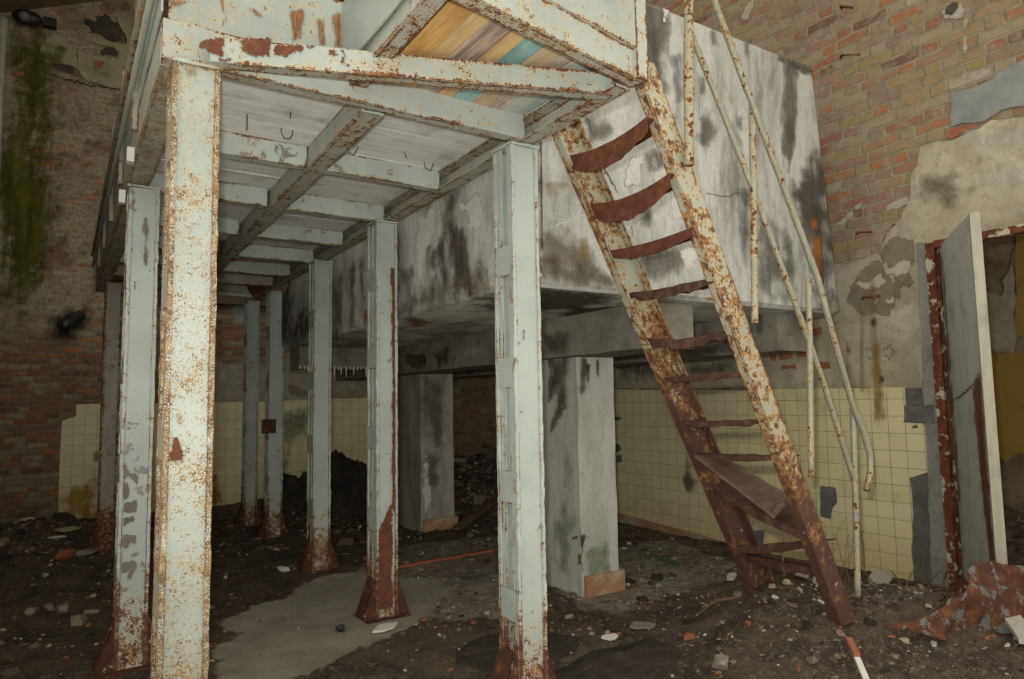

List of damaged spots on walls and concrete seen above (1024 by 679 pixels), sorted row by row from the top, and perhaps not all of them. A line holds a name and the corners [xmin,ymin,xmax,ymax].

rust [199,37,231,61]
rust [238,9,350,67]
water stain [646,1,680,95]
water stain [779,55,813,160]
flaking render [945,123,978,139]
water stain [402,193,495,312]
water stain [539,236,614,316]
rust [811,216,821,276]
water stain [794,152,861,296]
peeling [828,233,915,316]
rust [169,437,184,461]
rust [376,250,431,610]